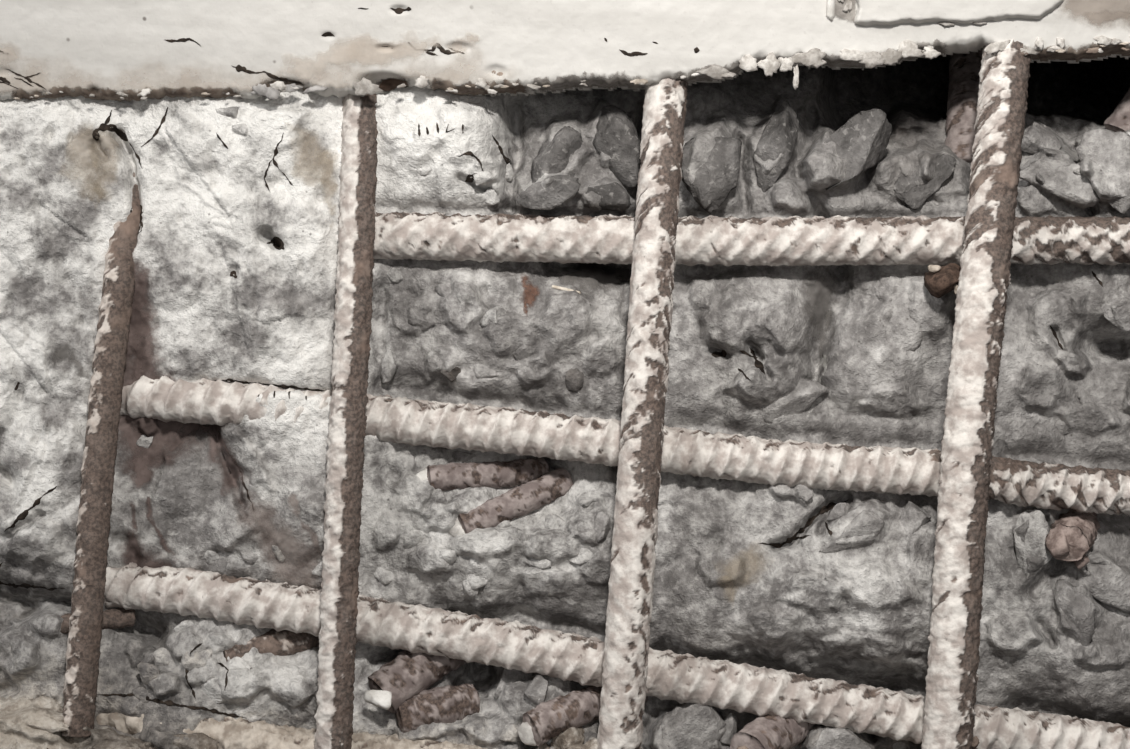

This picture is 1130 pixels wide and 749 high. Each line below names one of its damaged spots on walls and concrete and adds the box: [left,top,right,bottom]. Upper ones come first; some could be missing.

spalling [0,72,648,749]
spalling [582,35,1130,749]
crack [4,486,57,532]
crack [759,500,848,548]
crack [0,562,65,591]